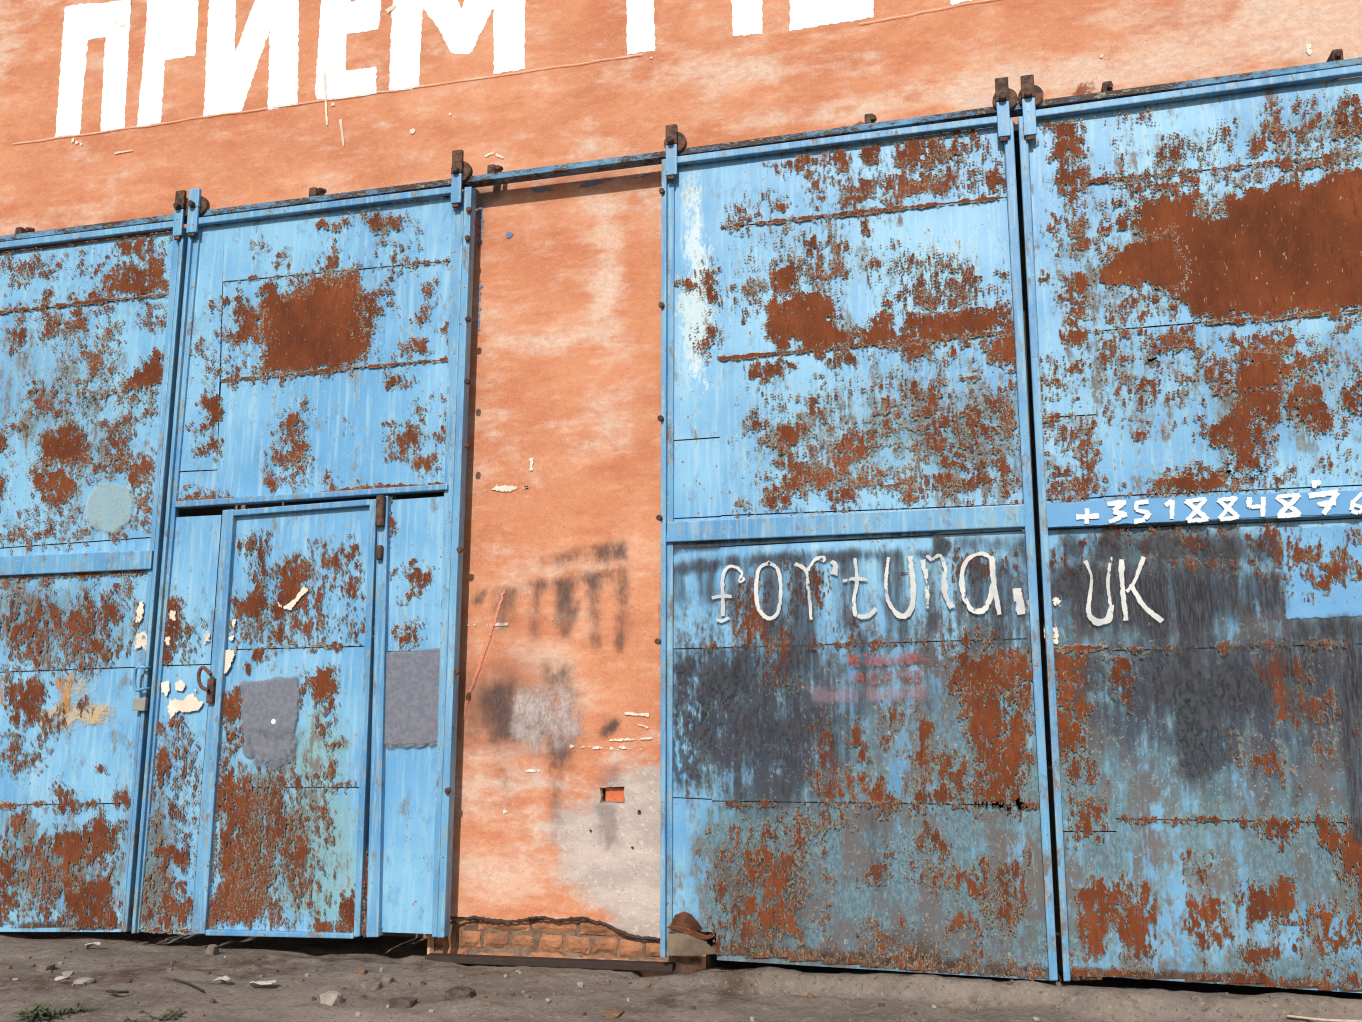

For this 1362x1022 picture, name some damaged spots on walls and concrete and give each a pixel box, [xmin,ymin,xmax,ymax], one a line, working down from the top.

corrosion [0,570,147,930]
corrosion [0,230,173,555]
peeling [161,679,203,719]
corrosion [139,528,435,938]
corrosion [176,200,450,546]
flaking render [431,916,702,965]
corrosion [674,118,1023,519]
corrosion [692,546,1362,991]
corrosion [1036,78,1362,503]
corrosion [1049,519,1362,604]